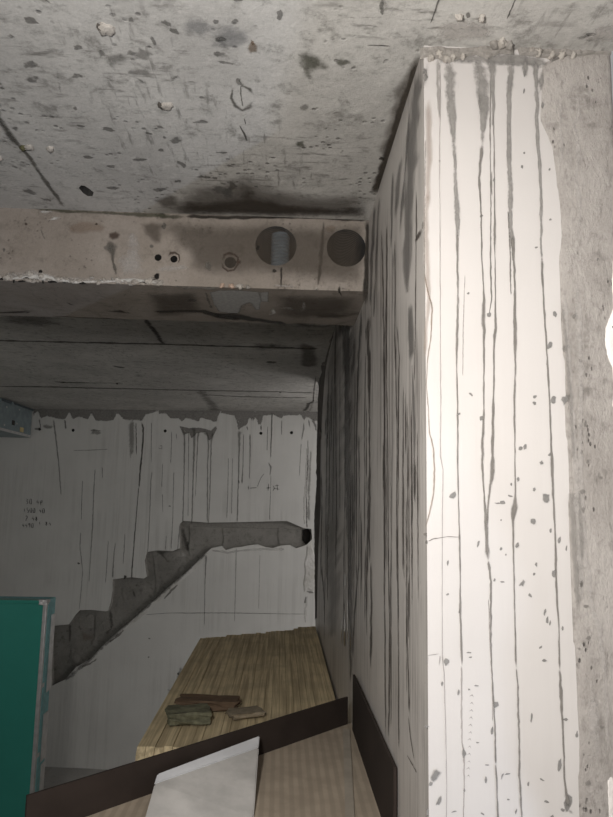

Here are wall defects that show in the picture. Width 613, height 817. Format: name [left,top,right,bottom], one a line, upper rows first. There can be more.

water stain [303,55,323,70]
crack [0,121,62,204]
spalling [0,270,163,286]
flaking render [605,310,613,368]
water stain [33,66,443,771]
water stain [440,54,569,817]
spalling [54,329,335,684]